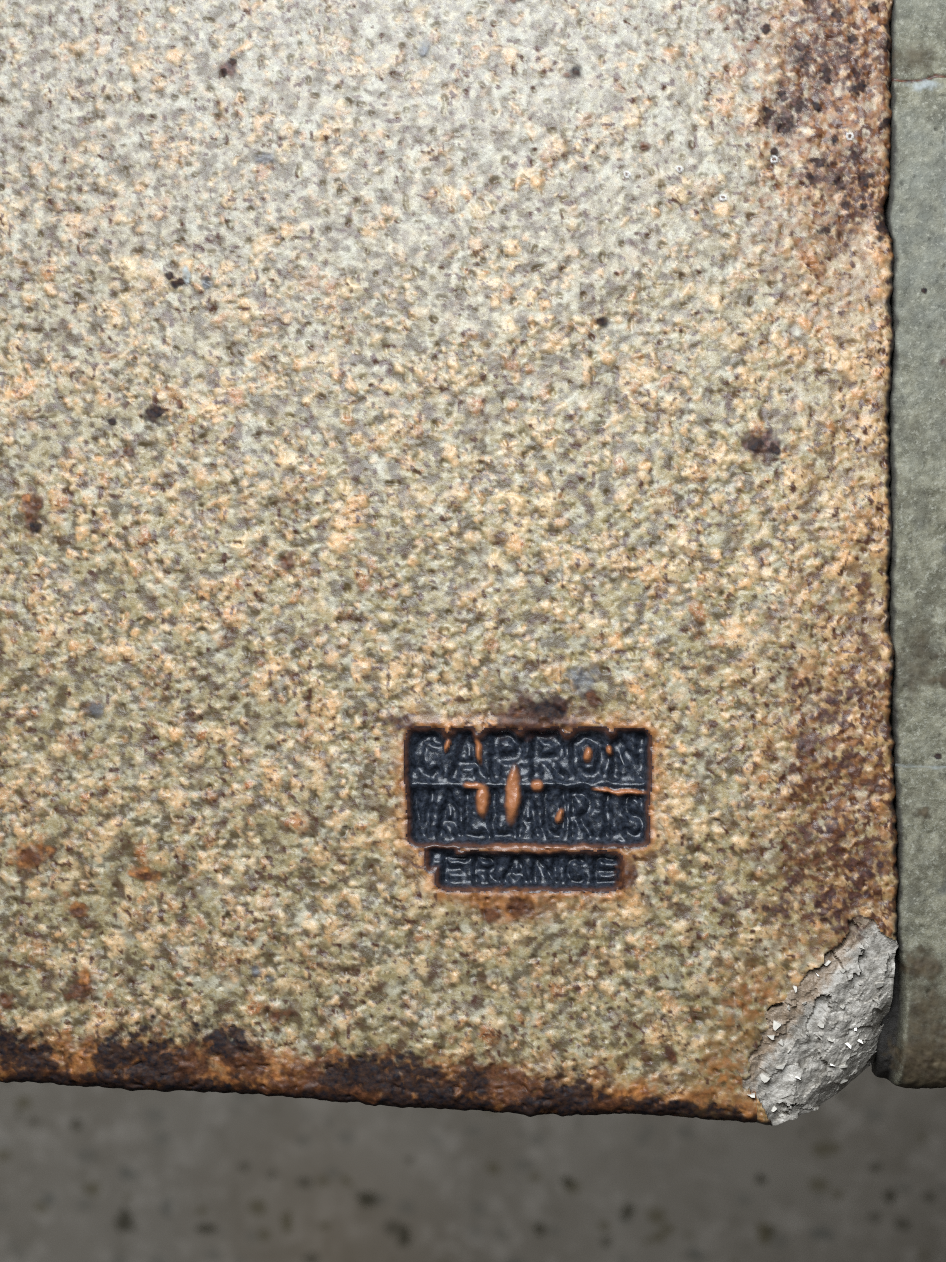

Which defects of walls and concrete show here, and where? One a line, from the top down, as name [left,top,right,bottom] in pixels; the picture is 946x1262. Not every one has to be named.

corrosion [735,0,771,34]
crack [892,74,946,82]
corrosion [763,0,892,256]
corrosion [848,624,872,646]
corrosion [810,669,888,726]
corrosion [762,733,889,939]
spalling [741,915,899,1125]